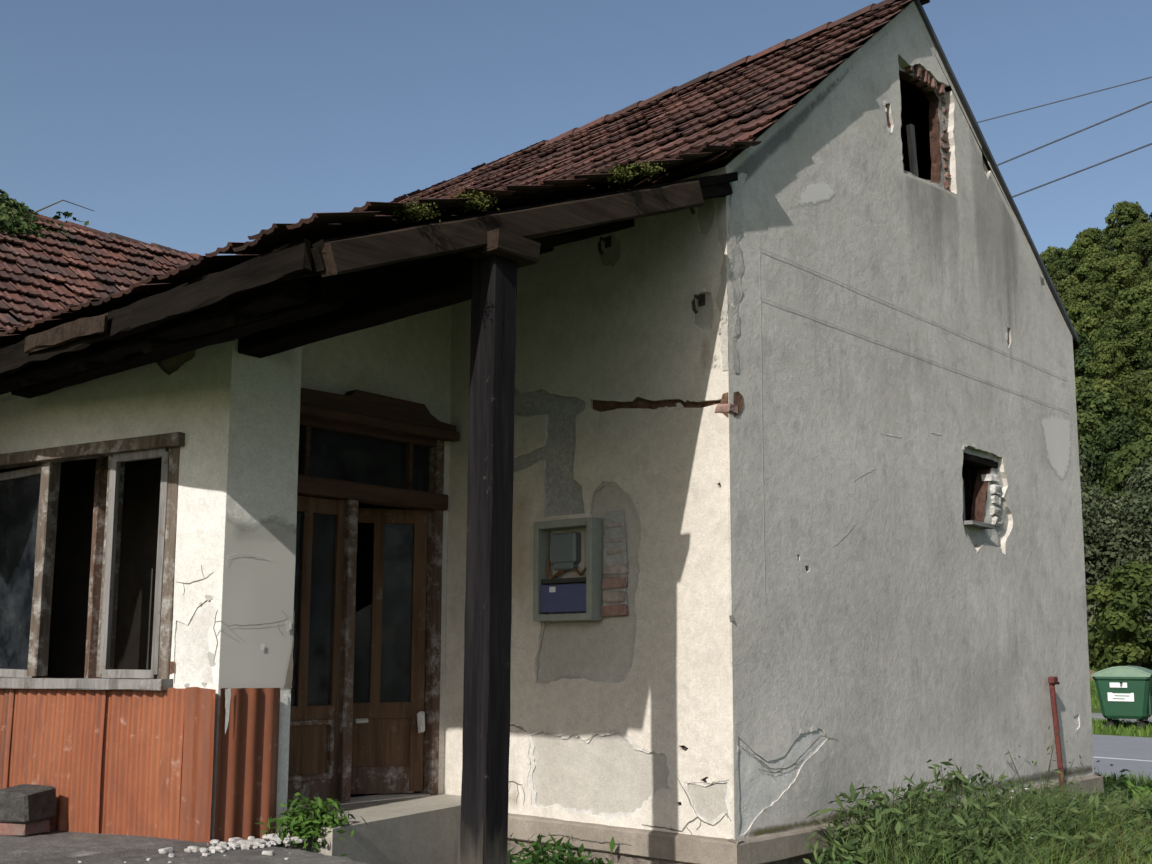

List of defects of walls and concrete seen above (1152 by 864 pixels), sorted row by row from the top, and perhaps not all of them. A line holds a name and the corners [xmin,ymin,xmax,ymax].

flaking render [898,55,955,192]
flaking render [715,403,739,414]
peeling [1039,412,1072,479]
crack [177,553,269,595]
spalling [536,481,641,684]
crack [213,611,287,662]
spalling [524,724,827,837]